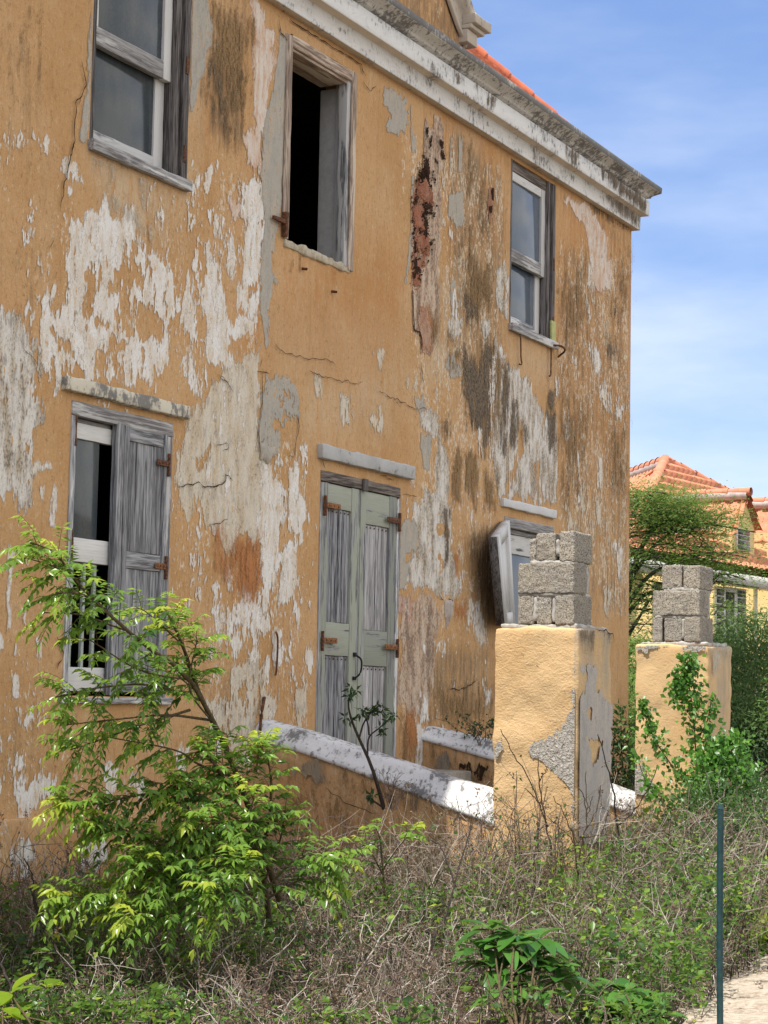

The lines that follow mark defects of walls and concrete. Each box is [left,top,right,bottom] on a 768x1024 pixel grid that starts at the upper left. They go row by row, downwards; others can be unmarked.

crack [60,64,87,211]
water stain [201,0,255,147]
water stain [590,166,647,321]
peeling [0,0,317,774]
crack [178,442,233,488]
crack [258,344,427,451]
water stain [429,140,528,617]
peeling [383,87,629,765]
water stain [546,256,592,497]
corrosion [215,525,263,602]
peeling [102,760,146,805]
peeling [527,654,613,845]